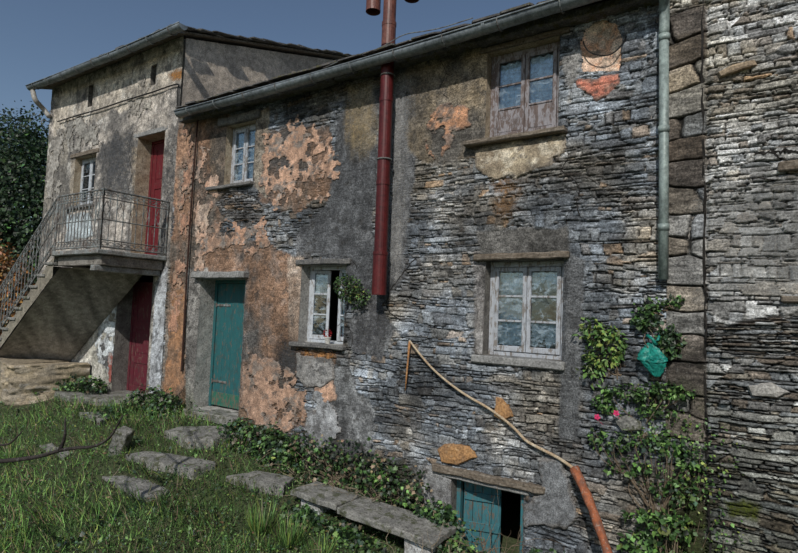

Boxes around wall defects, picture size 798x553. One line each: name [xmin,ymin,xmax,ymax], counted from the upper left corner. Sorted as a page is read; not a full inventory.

spalling [574,20,622,102]
peeling [425,102,472,160]
peeling [148,114,341,397]
peeling [240,352,342,450]